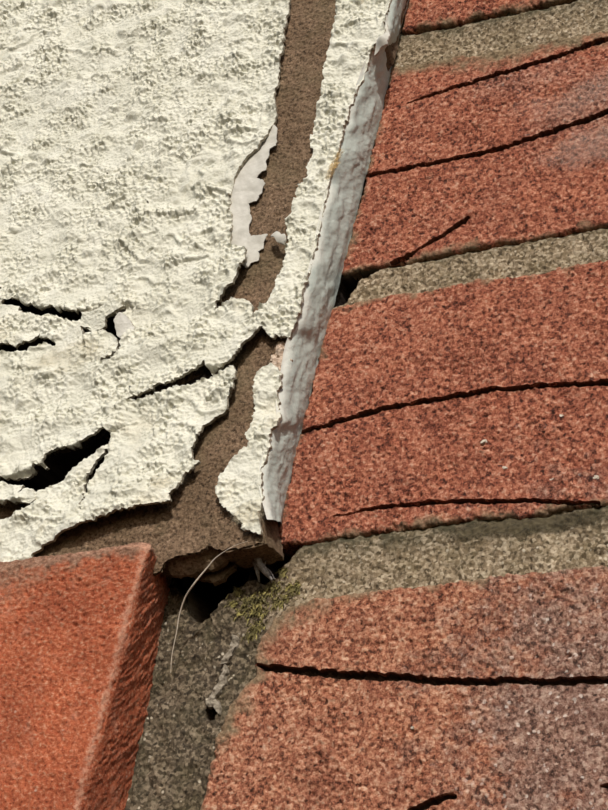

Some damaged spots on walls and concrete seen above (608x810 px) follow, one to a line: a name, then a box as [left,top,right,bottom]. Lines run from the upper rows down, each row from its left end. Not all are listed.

peeling [374,22,391,57]
crack [407,37,607,104]
peeling [217,0,336,312]
crack [365,108,608,181]
crack [389,216,470,268]
crack [0,287,136,360]
crack [301,379,608,434]
crack [0,431,111,519]
peeling [33,328,293,586]
crack [333,498,601,517]
crack [255,663,608,687]
crack [407,793,457,810]